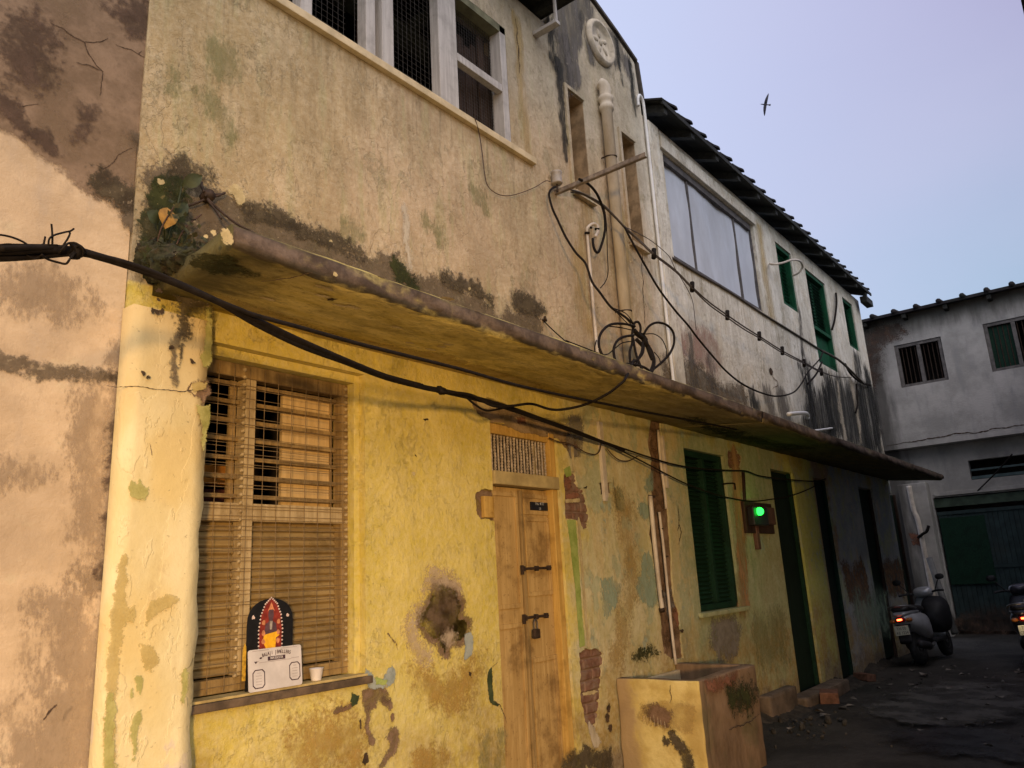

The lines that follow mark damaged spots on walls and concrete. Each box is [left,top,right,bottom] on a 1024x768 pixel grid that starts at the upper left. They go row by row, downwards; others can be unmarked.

crack [51,23,145,95]
leakage [546,0,595,162]
leakage [0,0,548,334]
crack [107,384,207,392]
peeling [187,295,589,458]
leakage [662,351,671,379]
leakage [681,309,908,454]
spalling [637,421,682,659]
peeling [102,553,179,768]
spalling [359,666,400,768]
spalling [579,648,602,727]
leakage [638,702,693,731]